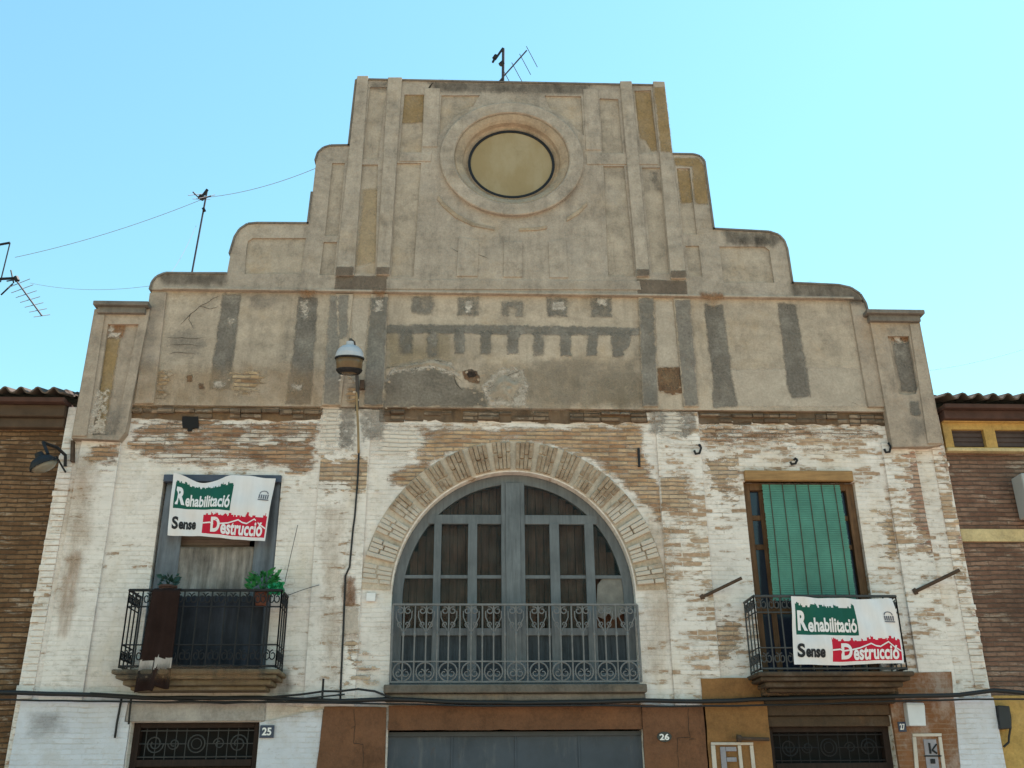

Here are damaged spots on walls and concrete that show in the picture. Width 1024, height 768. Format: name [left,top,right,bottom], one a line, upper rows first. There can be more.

crack [171,297,216,354]
flaking render [187,370,265,396]
flaking render [425,362,528,408]
peeling [83,375,697,588]
peeling [901,451,933,557]
peeling [869,509,897,560]
peeling [338,641,380,685]
peeling [716,615,743,662]